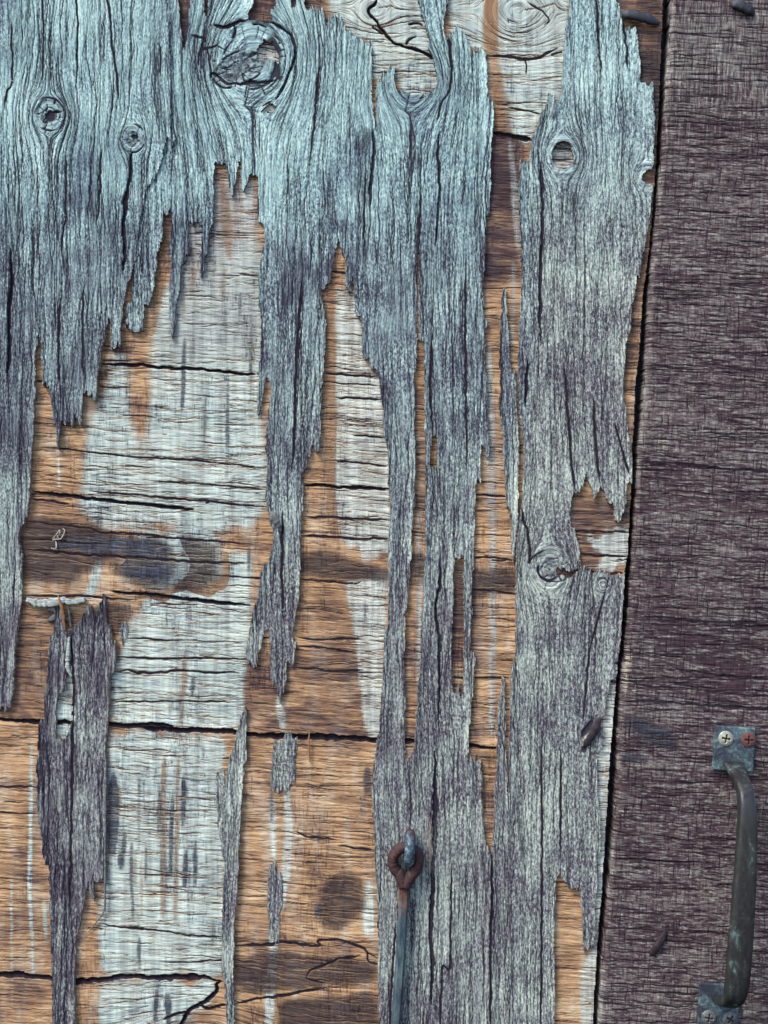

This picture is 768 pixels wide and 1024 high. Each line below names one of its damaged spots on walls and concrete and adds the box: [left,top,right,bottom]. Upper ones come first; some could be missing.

peeling [0,304,103,713]
damp [20,520,216,630]
crack [21,447,389,674]
peeling [245,432,305,704]
peeling [570,432,633,523]
crack [109,700,377,742]
crack [469,742,497,750]
peeling [507,577,625,1024]
damp [314,875,375,937]
crack [0,924,396,1024]